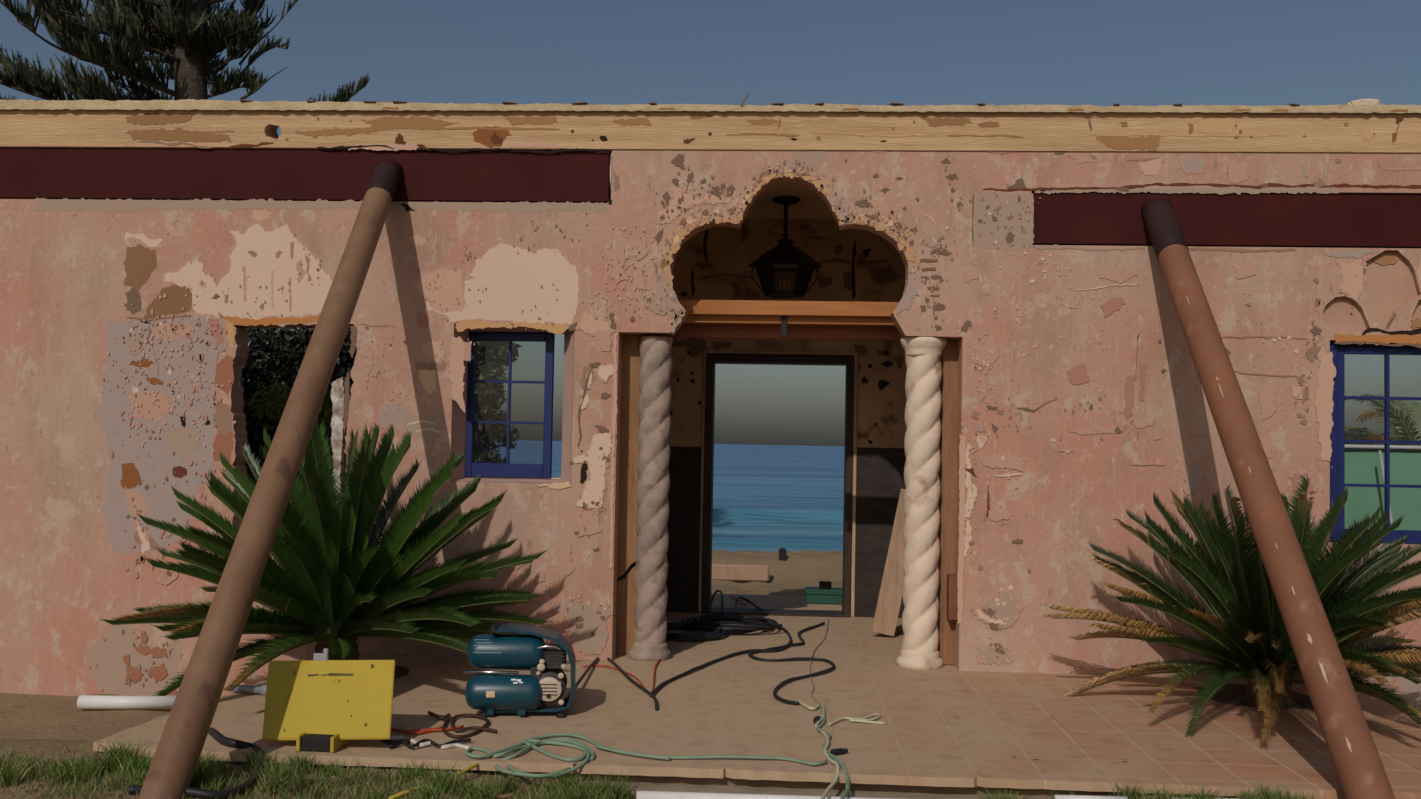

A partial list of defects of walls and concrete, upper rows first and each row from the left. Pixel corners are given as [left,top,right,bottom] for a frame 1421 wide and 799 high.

spalling [348,142,424,151]
crack [960,148,1048,156]
peeling [125,225,175,247]
peeling [389,137,952,363]
spalling [941,158,1034,249]
crack [972,183,1421,247]
peeling [143,209,333,463]
peeling [580,362,613,410]
peeling [125,484,160,562]
spalling [165,465,187,482]
peeling [570,426,612,551]
peeling [88,623,183,696]